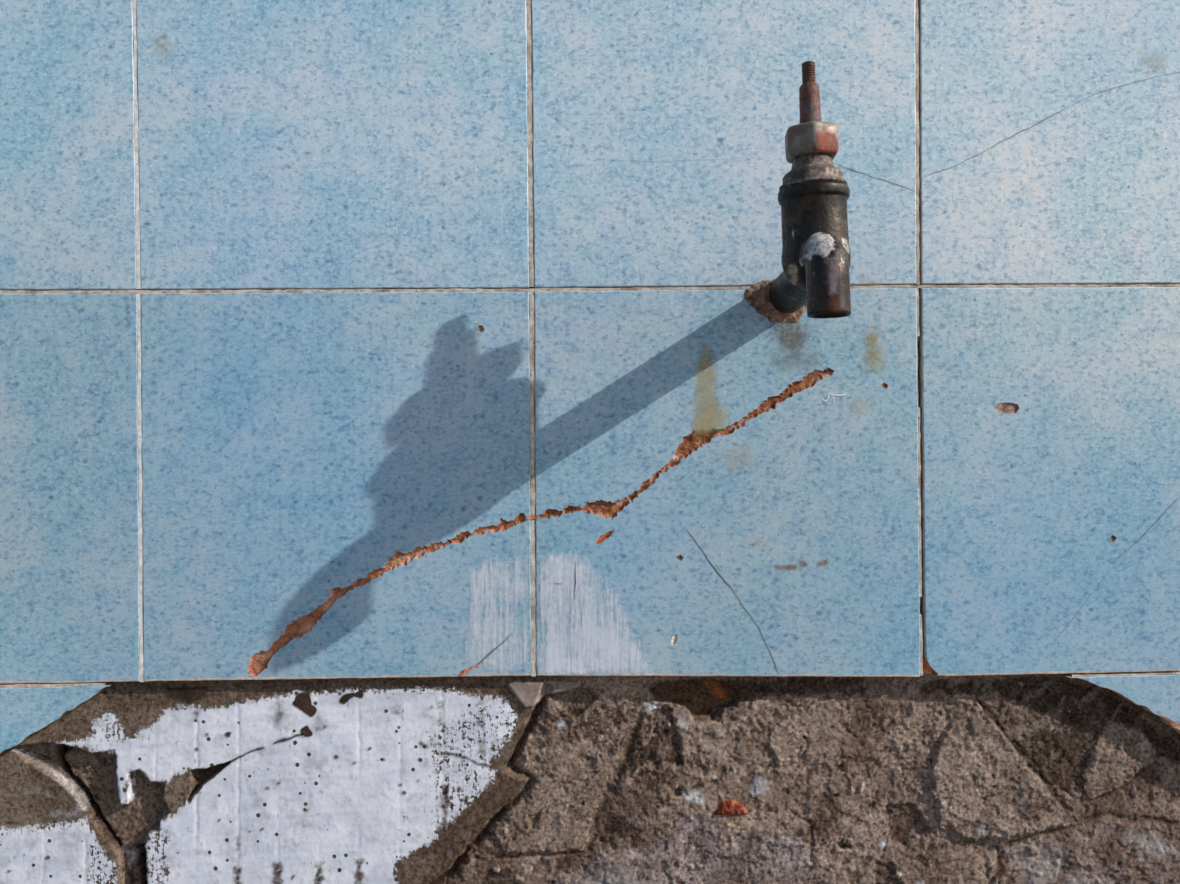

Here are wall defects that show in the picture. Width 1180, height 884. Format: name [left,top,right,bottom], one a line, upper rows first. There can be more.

corrosion [814,132,838,154]
spalling [994,402,1019,413]
crack [247,367,834,677]
peeling [0,815,118,884]
crack [59,746,147,884]
peeling [49,680,579,884]
crack [977,700,1075,821]